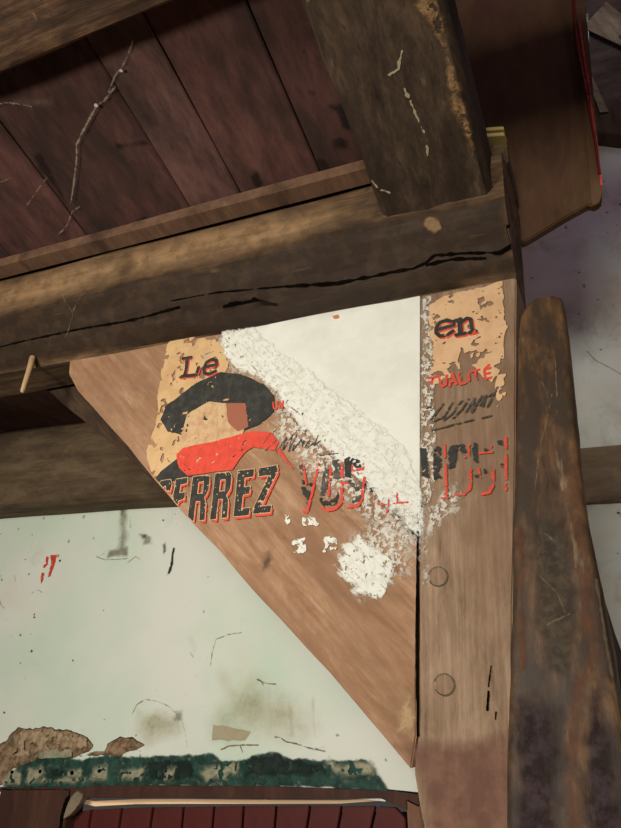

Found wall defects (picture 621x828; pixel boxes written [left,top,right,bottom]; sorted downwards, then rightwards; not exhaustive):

crack [0,225,511,347]
peeling [0,198,514,599]